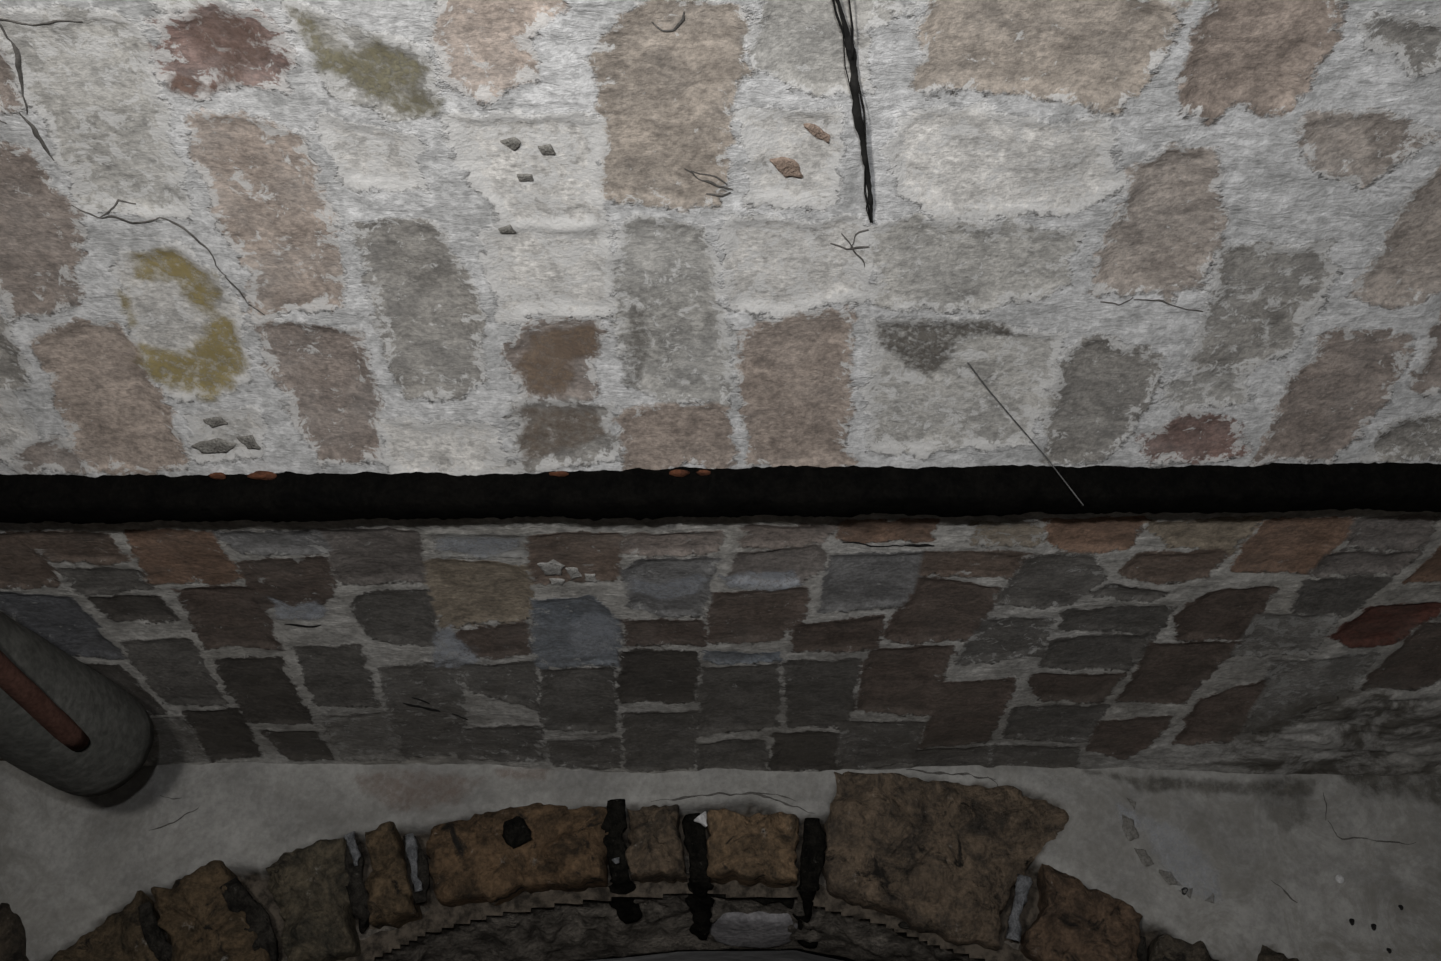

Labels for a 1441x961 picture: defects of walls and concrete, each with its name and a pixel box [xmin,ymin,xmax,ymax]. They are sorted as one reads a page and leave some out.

crack [0,18,82,161]